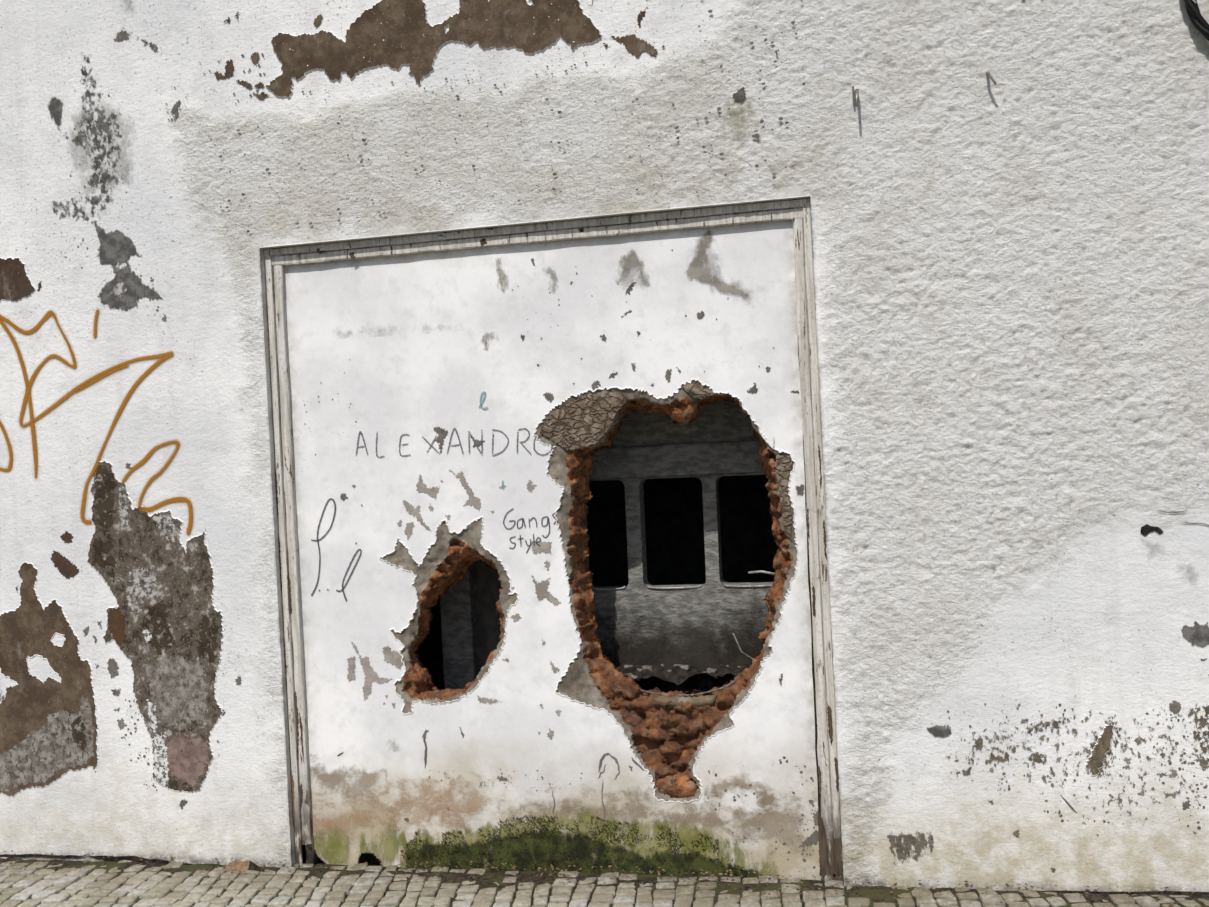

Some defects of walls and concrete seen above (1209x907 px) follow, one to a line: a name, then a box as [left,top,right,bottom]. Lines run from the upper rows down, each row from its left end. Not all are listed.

peeling [199,0,665,104]
peeling [0,256,42,303]
peeling [434,427,448,453]
peeling [0,460,241,809]
spalling [347,470,521,715]
spalling [527,359,804,810]
spalling [1141,524,1163,536]
flaking render [769,756,819,870]
peeling [935,700,1209,836]